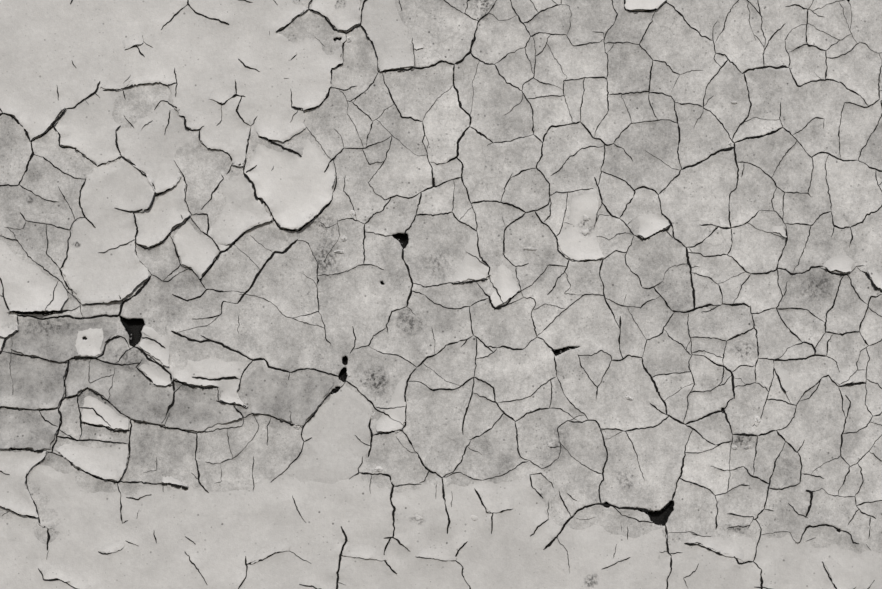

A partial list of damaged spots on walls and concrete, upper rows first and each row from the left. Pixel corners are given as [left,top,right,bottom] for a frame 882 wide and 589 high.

crack [125,0,229,57]
peeling [624,0,666,10]
crack [0,81,104,202]
crack [108,125,147,177]
crack [154,100,211,149]
peeling [0,0,414,304]
crack [214,81,257,154]
crack [0,161,259,325]
crack [171,301,339,391]
crack [234,0,882,589]
crack [0,331,294,560]
peeling [0,235,882,589]